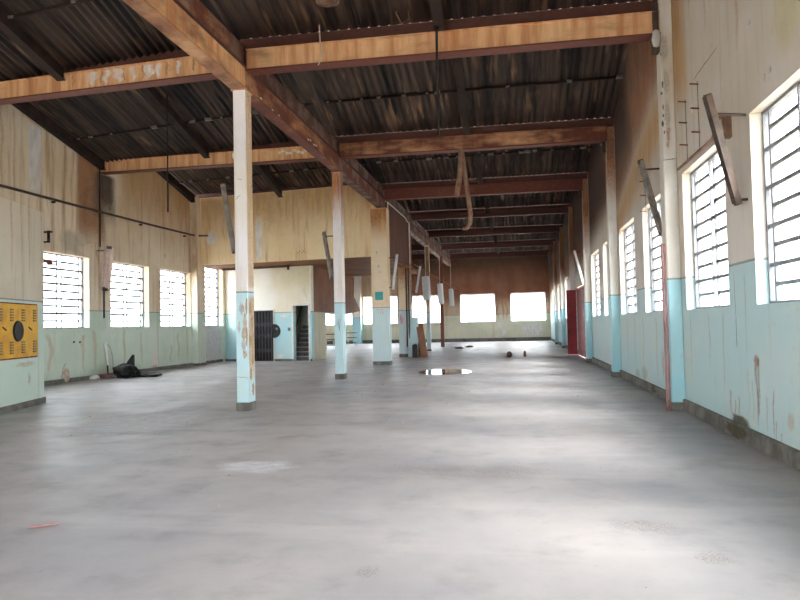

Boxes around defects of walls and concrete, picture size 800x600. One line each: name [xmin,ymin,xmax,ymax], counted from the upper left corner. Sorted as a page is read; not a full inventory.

peeling [87,60,182,86]
peeling [238,299,248,359]
water stain [722,316,750,441]
rust [747,356,795,442]